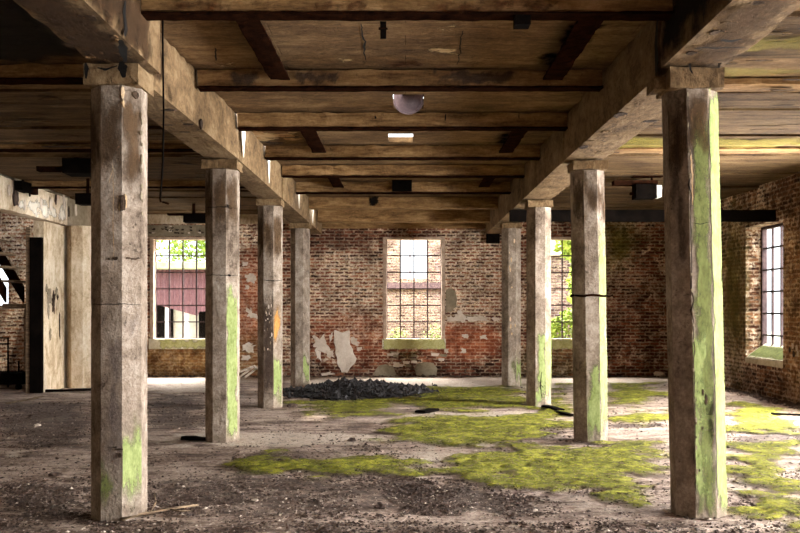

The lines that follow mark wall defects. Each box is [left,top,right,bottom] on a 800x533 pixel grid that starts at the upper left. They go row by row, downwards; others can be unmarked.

crack [359,24,367,60]
peeling [446,289,500,323]
water stain [620,92,800,509]
water stain [226,287,237,435]
peeling [312,330,362,376]
peeling [374,349,449,376]